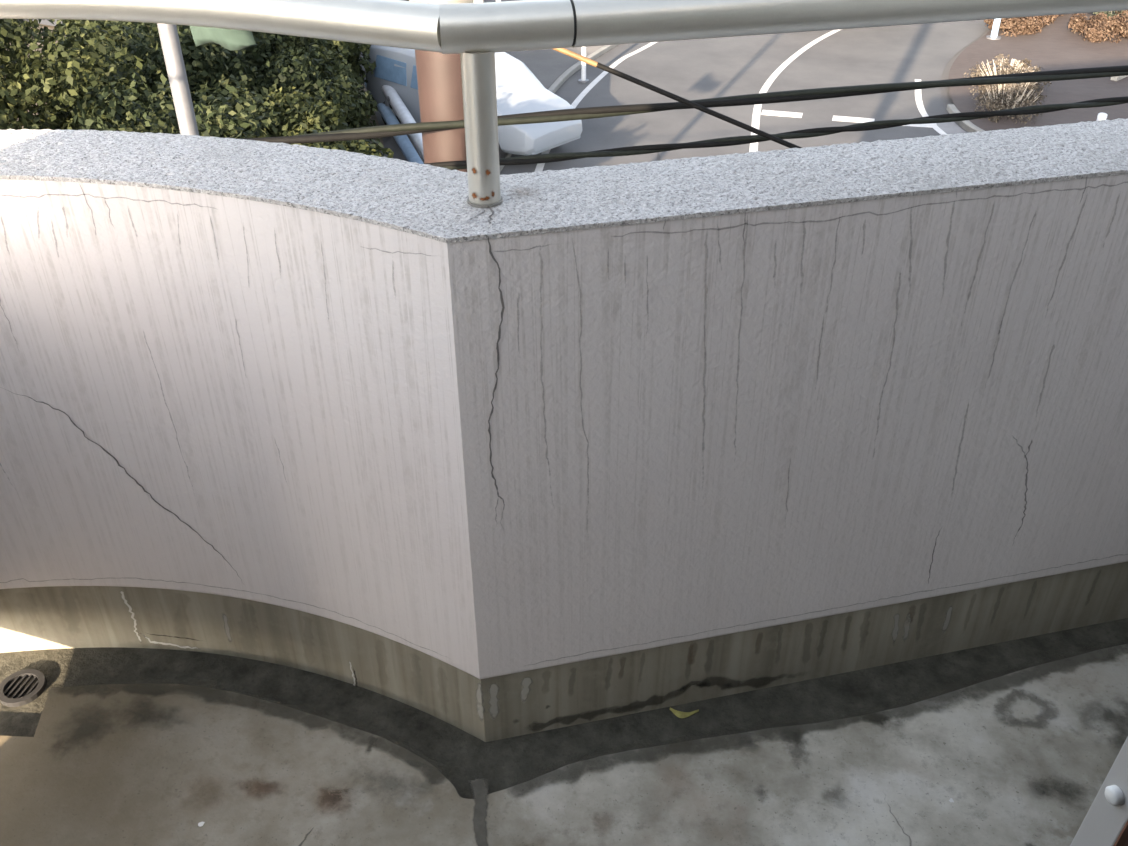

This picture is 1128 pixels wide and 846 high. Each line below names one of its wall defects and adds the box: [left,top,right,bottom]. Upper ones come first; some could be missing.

crack [487,207,505,509]
crack [17,394,238,575]
water stain [120,591,198,649]
water stain [60,679,445,784]
water stain [477,684,498,719]
water stain [512,644,1128,797]
crack [470,778,488,846]